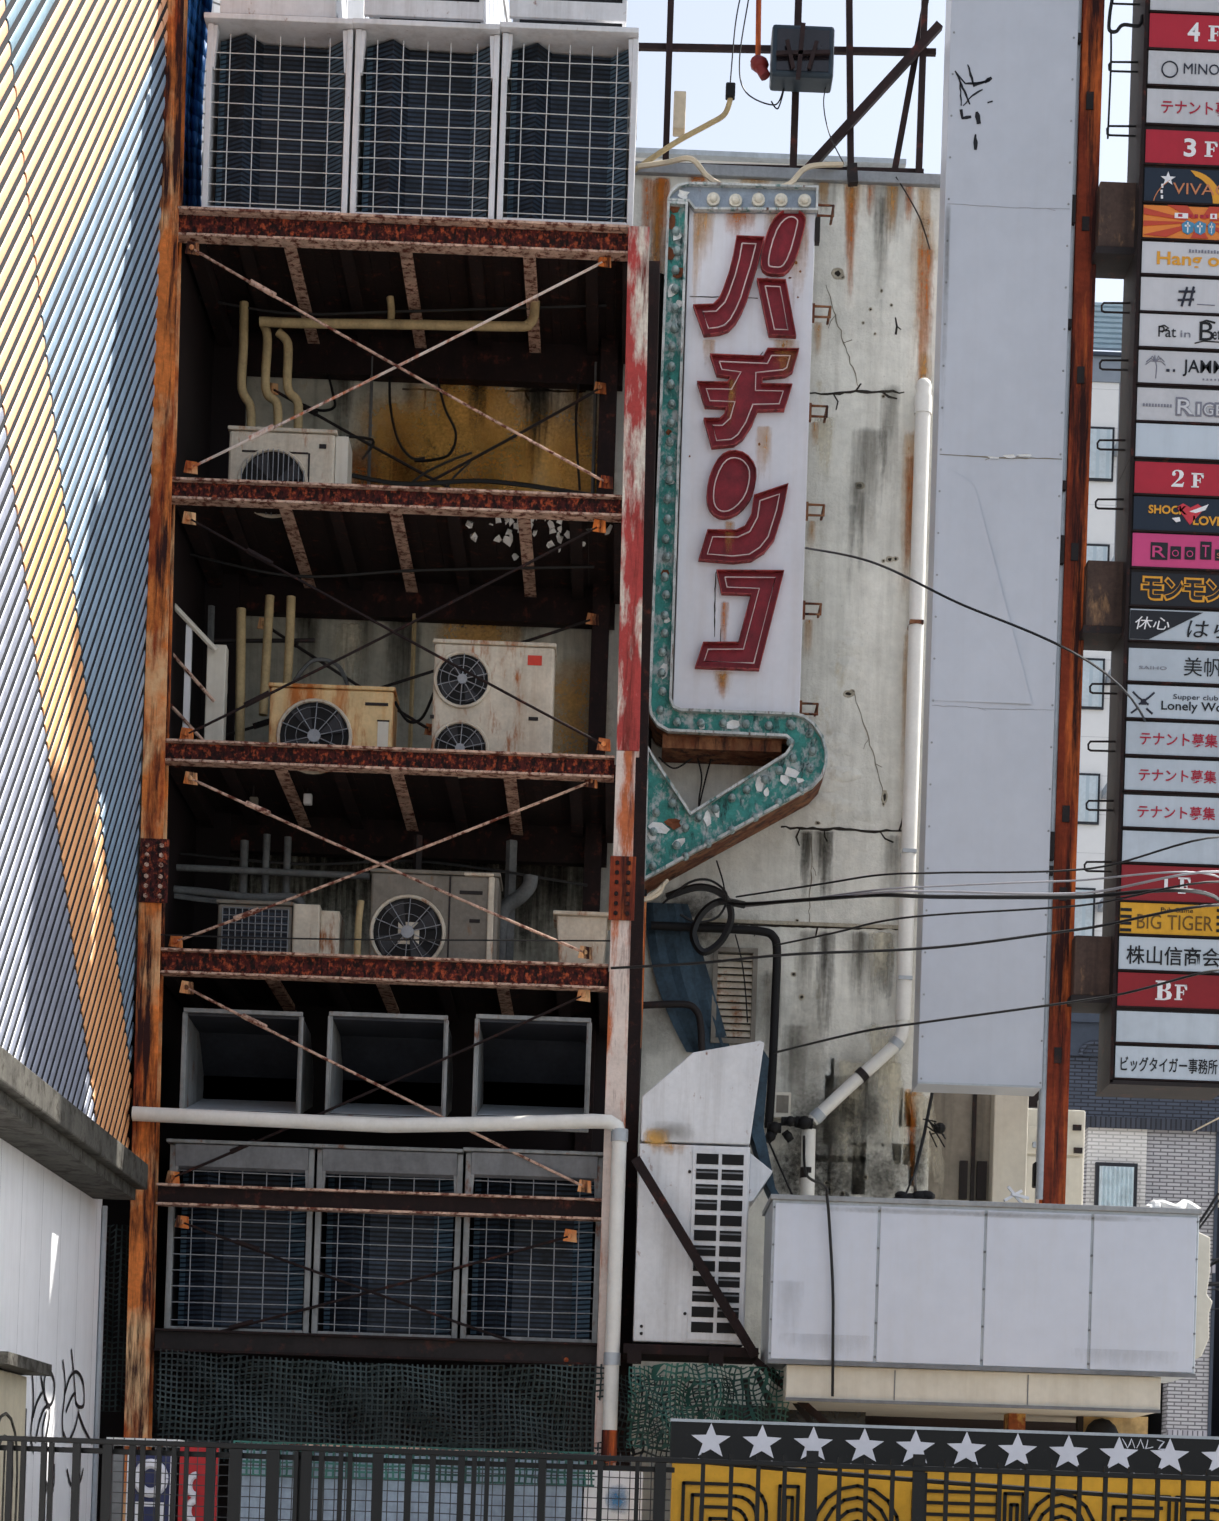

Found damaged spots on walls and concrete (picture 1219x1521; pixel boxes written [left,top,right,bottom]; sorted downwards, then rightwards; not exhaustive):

corrosion [644,178,668,261]
corrosion [732,213,746,226]
corrosion [846,185,871,267]
corrosion [889,186,931,378]
damp [352,385,597,493]
damp [803,832,830,879]
damp [821,933,830,978]
damp [875,932,890,969]
damp [813,1061,867,1197]
damp [916,1096,930,1183]